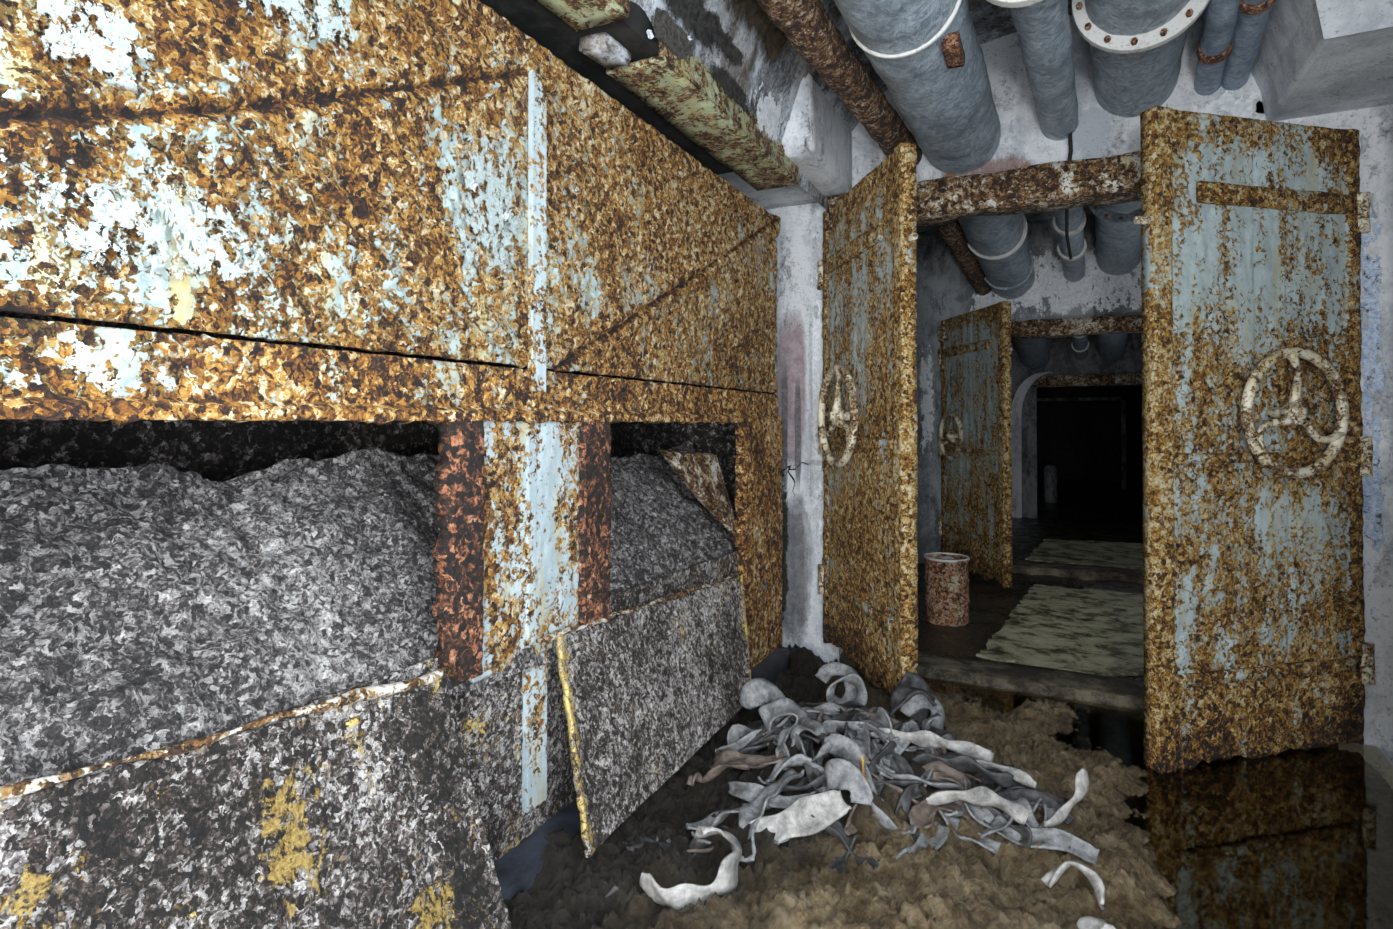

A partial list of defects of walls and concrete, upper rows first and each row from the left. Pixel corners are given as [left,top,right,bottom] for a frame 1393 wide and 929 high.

rust [945,156,1030,177]